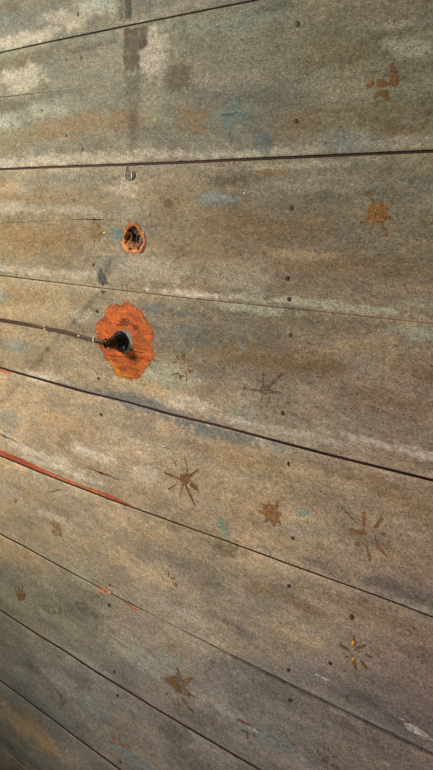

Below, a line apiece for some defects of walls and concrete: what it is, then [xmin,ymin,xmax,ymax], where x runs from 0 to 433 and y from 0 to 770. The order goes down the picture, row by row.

leakage [121,0,147,70]
corrosion [366,64,398,100]